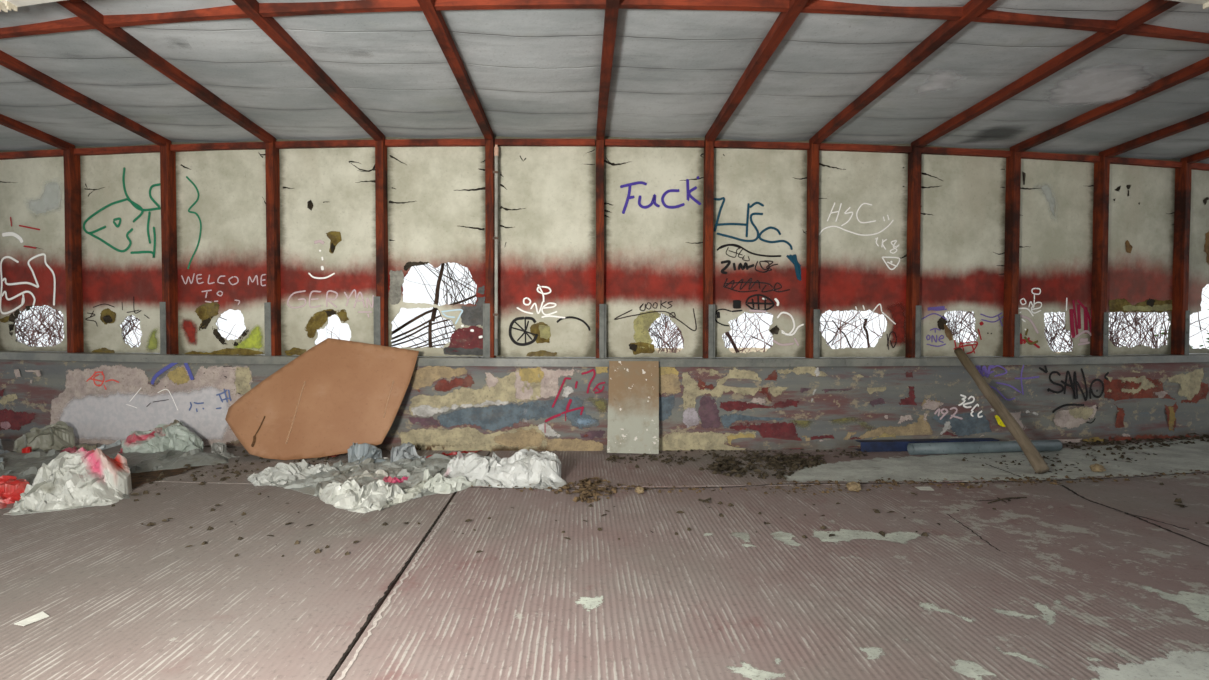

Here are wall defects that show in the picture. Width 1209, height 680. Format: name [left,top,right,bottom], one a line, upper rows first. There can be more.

spalling [404,261,428,271]
spalling [629,310,662,355]
spalling [937,315,953,341]
peeling [399,281,605,453]
peeling [0,364,253,446]
peeling [659,367,1209,483]
crack [617,464,1209,551]
peeling [770,529,920,549]
peeling [915,600,973,622]
peeling [988,600,1066,625]
peeling [1140,586,1209,622]
peeling [1071,648,1209,680]